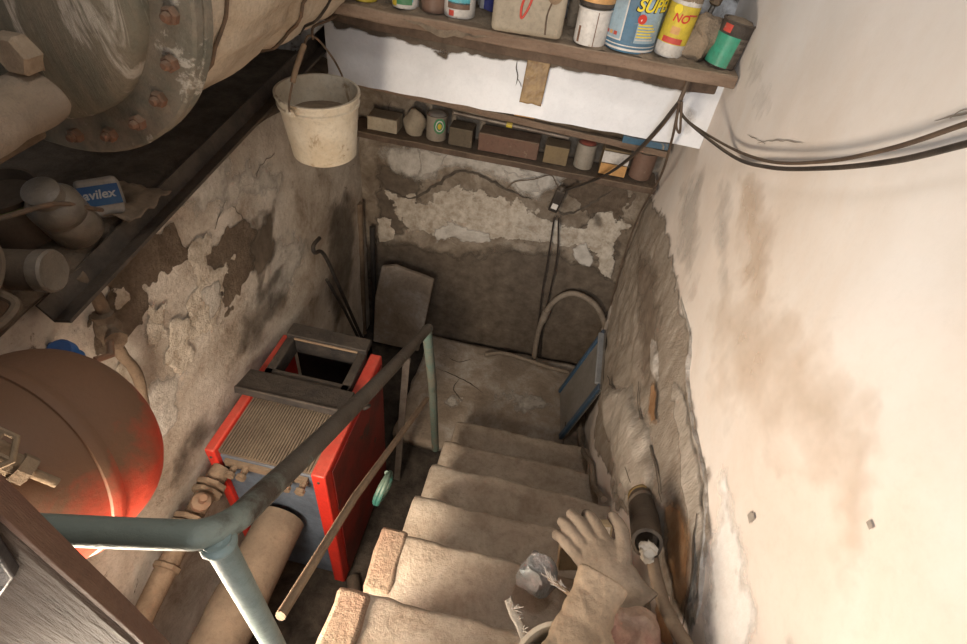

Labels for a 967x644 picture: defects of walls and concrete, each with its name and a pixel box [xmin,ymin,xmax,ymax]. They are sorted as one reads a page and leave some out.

peeling [87,314,107,356]
peeling [116,363,134,386]
peeling [106,222,236,374]
flaking render [377,147,710,637]
leakage [705,474,755,644]